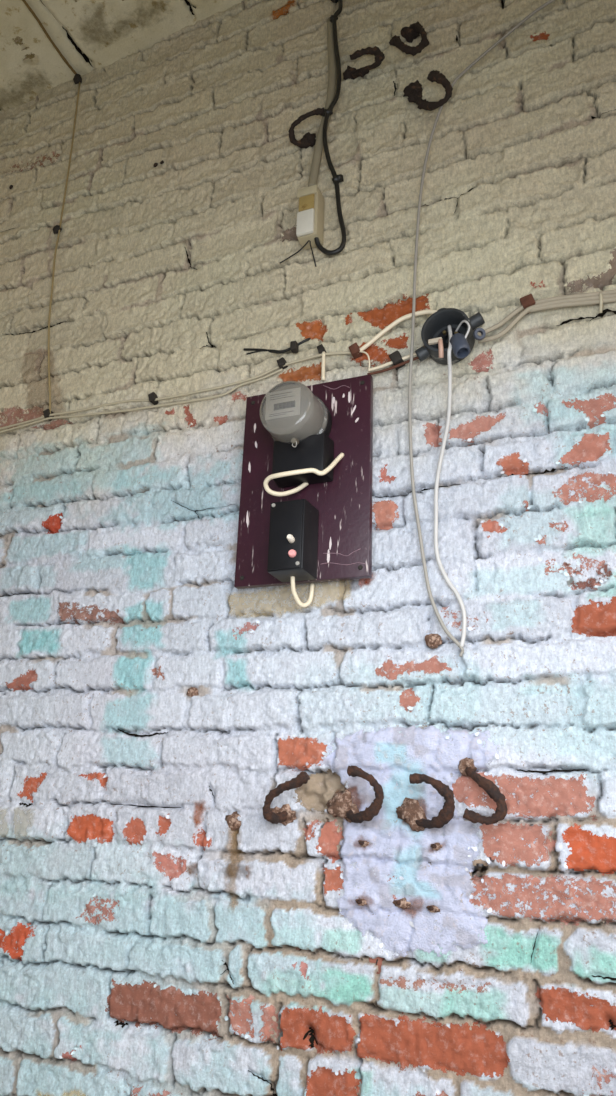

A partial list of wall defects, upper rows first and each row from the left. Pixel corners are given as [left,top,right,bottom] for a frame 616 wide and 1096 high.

crack [40,0,92,66]
spalling [564,248,616,293]
peeling [422,412,506,447]
peeling [496,452,529,478]
peeling [552,393,616,505]
peeling [372,498,399,531]
peeling [481,519,507,538]
peeling [534,520,616,638]
peeling [66,814,171,846]
peeling [152,851,187,881]
peeling [535,986,616,1033]
peeling [105,975,510,1096]